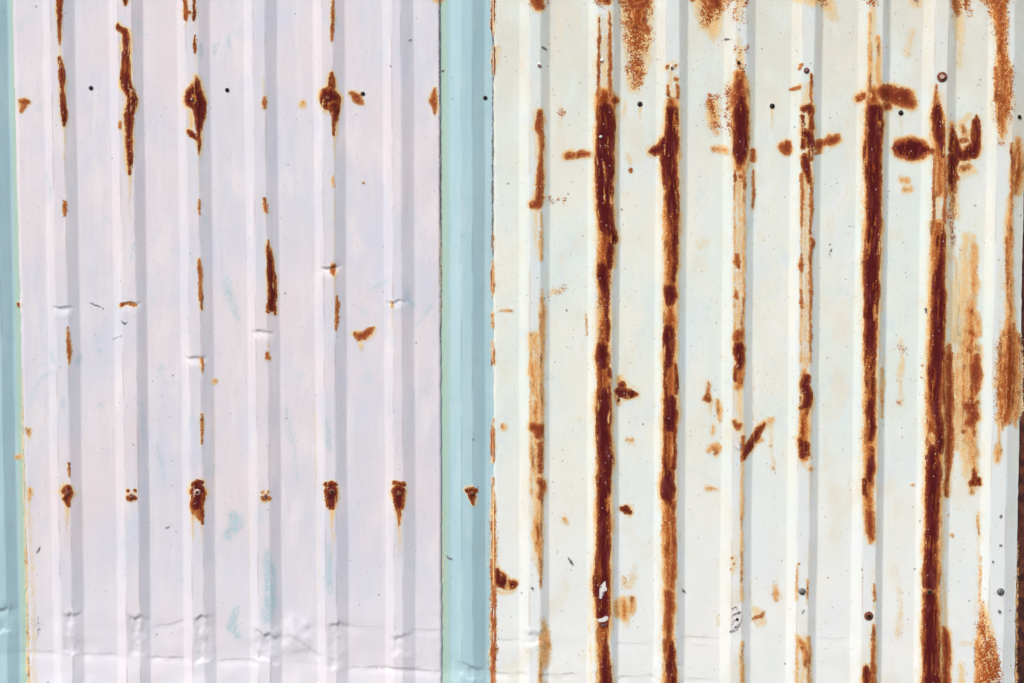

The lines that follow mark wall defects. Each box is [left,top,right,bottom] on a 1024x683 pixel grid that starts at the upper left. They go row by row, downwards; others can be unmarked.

rust [54,0,69,162]
rust [113,20,141,220]
rust [180,0,209,217]
rust [186,354,219,548]
rust [263,239,280,316]
rust [298,68,377,351]
rust [525,284,567,590]
rust [526,103,567,262]
rust [560,0,711,683]
rust [701,36,811,628]
rust [775,62,845,513]
rust [851,0,1024,683]